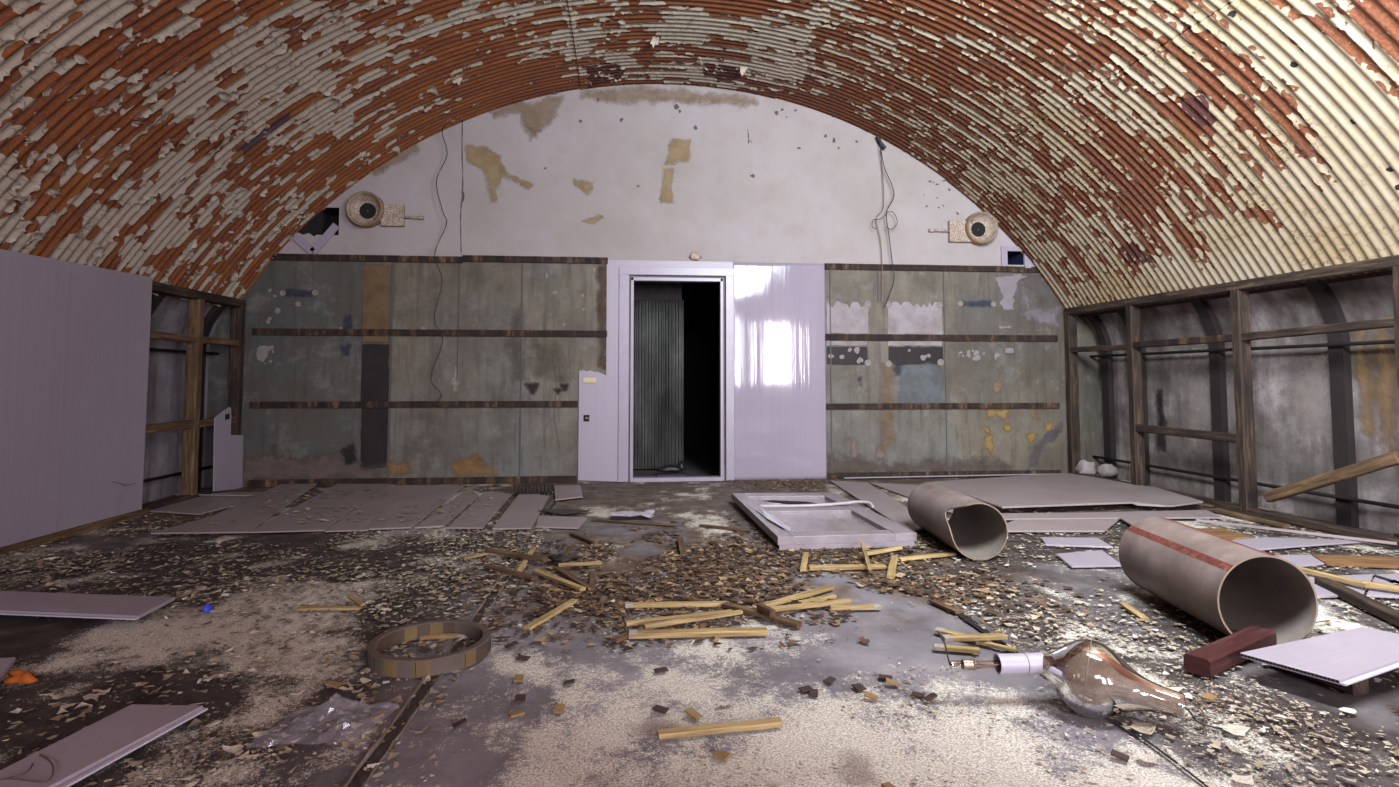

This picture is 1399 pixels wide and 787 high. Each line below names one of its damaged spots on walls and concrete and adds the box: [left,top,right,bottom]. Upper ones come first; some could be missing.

corrosion [1179,94,1216,126]
corrosion [235,112,291,153]
peeling [0,0,1399,329]
corrosion [1119,241,1157,264]
peeling [256,345,274,364]
peeling [828,347,863,364]
peeling [959,348,1014,361]